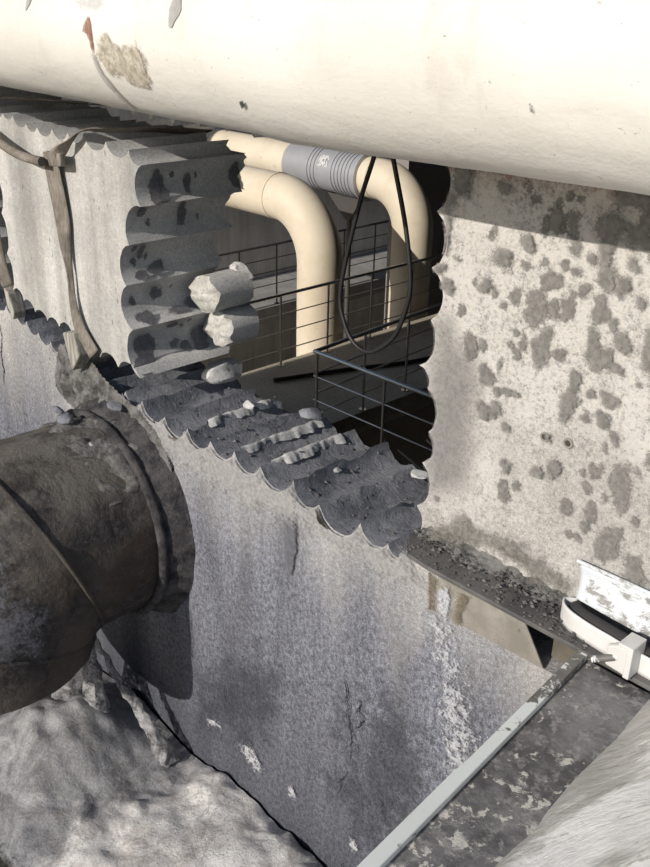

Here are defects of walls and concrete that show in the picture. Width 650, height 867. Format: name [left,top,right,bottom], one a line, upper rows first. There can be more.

peeling [96,33,150,88]
peeling [168,0,181,27]
spalling [207,399,272,428]
damp [136,404,418,583]
spalling [241,419,346,464]
damp [430,168,650,586]
damp [431,576,488,776]
crack [337,679,364,806]